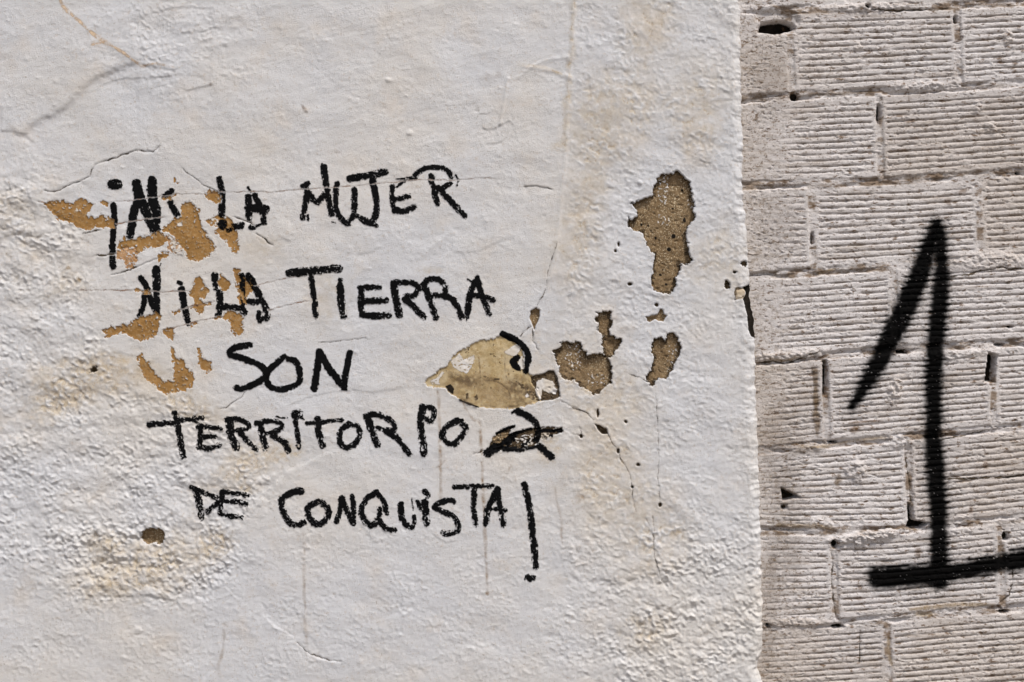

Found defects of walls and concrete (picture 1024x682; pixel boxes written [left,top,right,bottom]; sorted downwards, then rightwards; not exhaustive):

crack [41,146,159,204]
peeling [44,177,240,269]
crack [82,198,223,329]
crack [176,168,270,244]
spalling [628,171,695,322]
peeling [102,268,253,395]
spalling [425,308,622,409]
spalling [646,333,681,386]